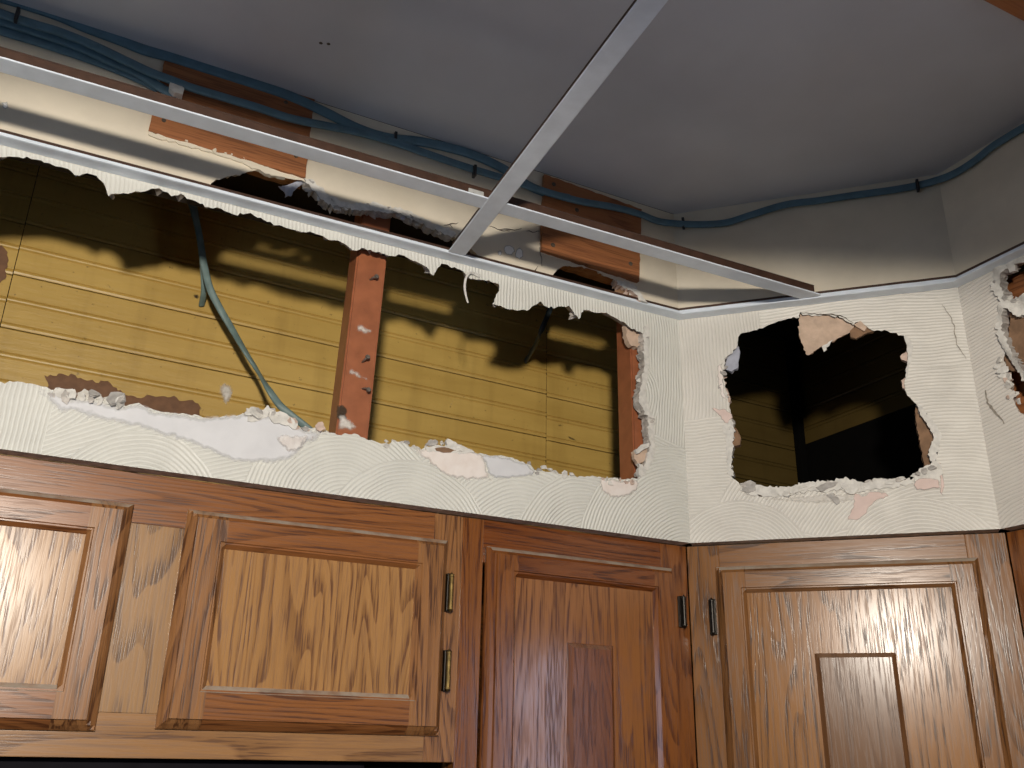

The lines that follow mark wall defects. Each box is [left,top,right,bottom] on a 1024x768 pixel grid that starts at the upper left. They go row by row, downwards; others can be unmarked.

flaking render [302,178,456,242]
peeling [0,245,9,282]
peeling [1007,255,1024,274]
flaking render [611,280,647,302]
peeling [994,356,1021,405]
flaking render [44,373,329,461]
flaking render [601,324,656,497]
flaking render [713,346,944,520]
flaking render [383,438,574,479]